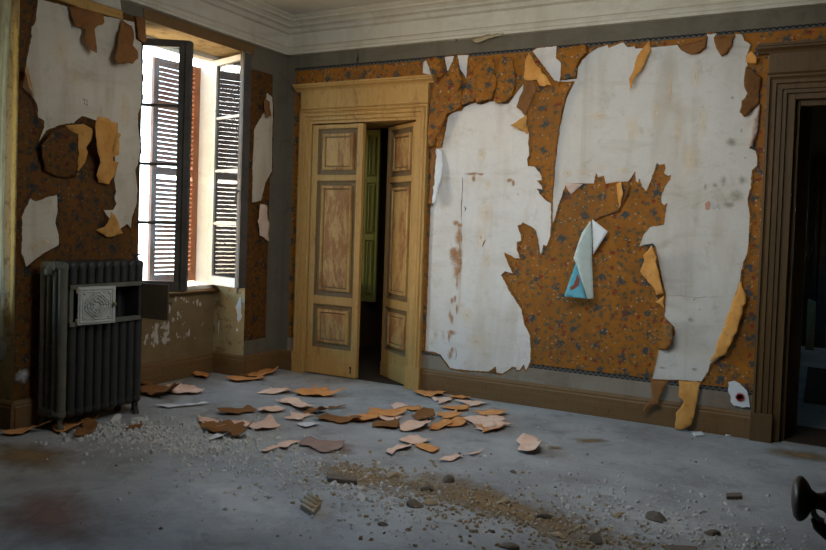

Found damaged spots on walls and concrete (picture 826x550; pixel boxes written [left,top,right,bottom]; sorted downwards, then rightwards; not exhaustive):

peeling [9,0,147,321]
peeling [143,296,201,347]
peeling [251,91,274,241]
peeling [422,32,762,430]